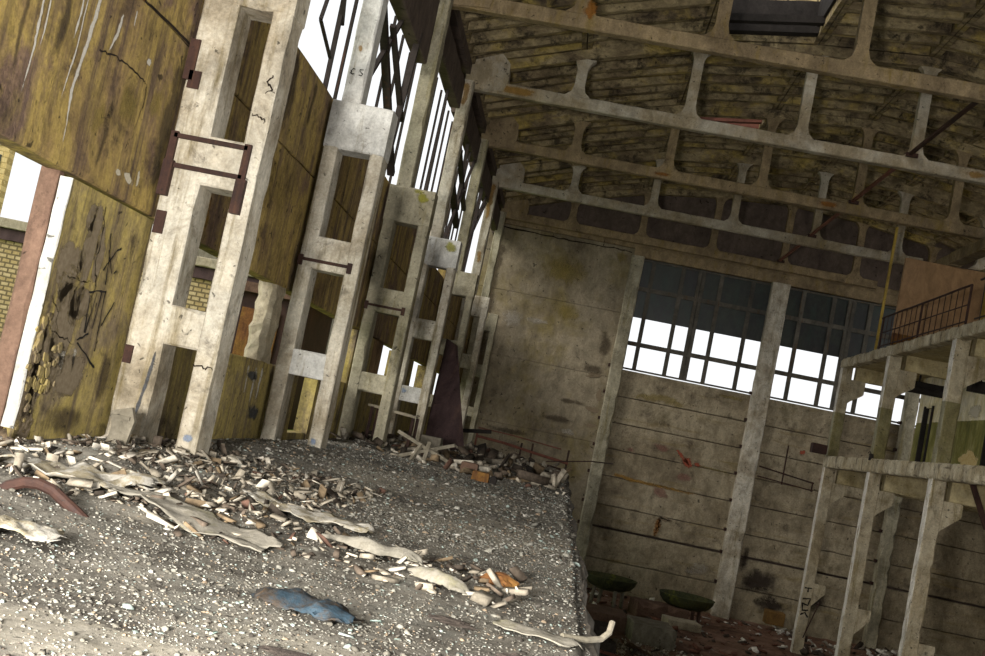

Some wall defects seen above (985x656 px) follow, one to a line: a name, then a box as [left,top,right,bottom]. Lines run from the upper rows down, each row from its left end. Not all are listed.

crack [99,49,147,134]
flaking render [15,201,106,438]